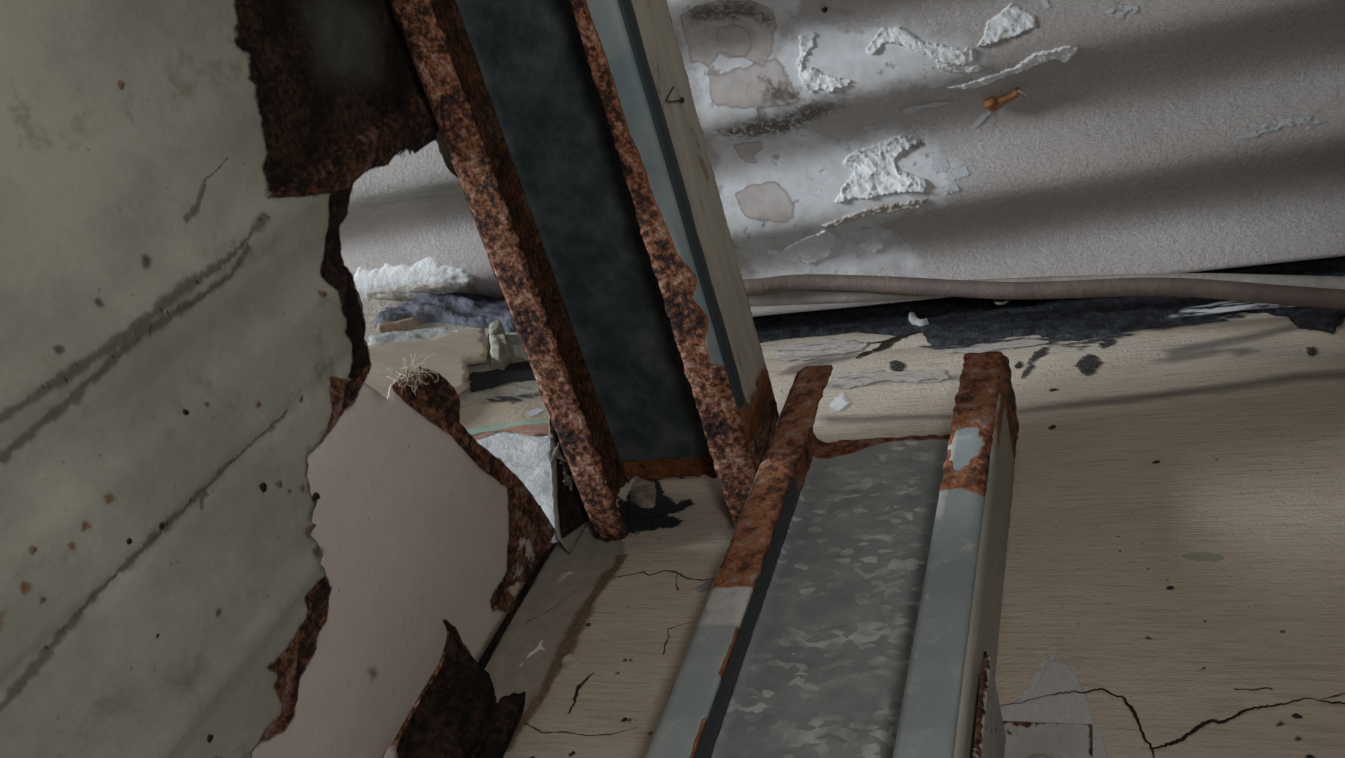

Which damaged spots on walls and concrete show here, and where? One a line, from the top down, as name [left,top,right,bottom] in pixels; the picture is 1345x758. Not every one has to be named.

peeling [796,31,852,93]
peeling [866,2,1078,89]
rust [235,0,439,441]
water stain [667,0,986,279]
peeling [767,134,928,265]
rust [392,367,589,615]
crack [1000,687,1345,758]